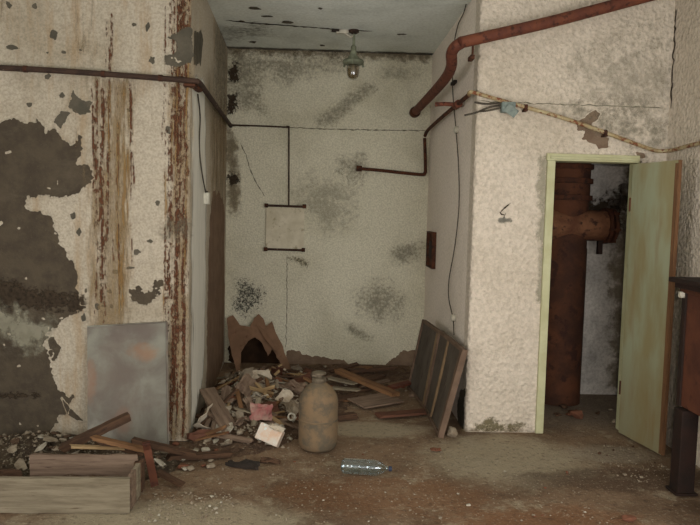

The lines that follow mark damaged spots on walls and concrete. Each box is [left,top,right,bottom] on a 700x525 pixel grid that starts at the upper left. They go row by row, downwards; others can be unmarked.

corrosion [164,0,191,54]
spalling [164,27,203,67]
crack [519,10,677,108]
corrosion [90,14,135,325]
crack [233,126,265,196]
crack [290,125,425,133]
spalling [575,108,610,152]
spalling [0,82,113,436]
spalling [127,275,169,309]
corrosion [161,61,189,440]
leakage [232,271,266,319]
spalling [205,188,350,388]